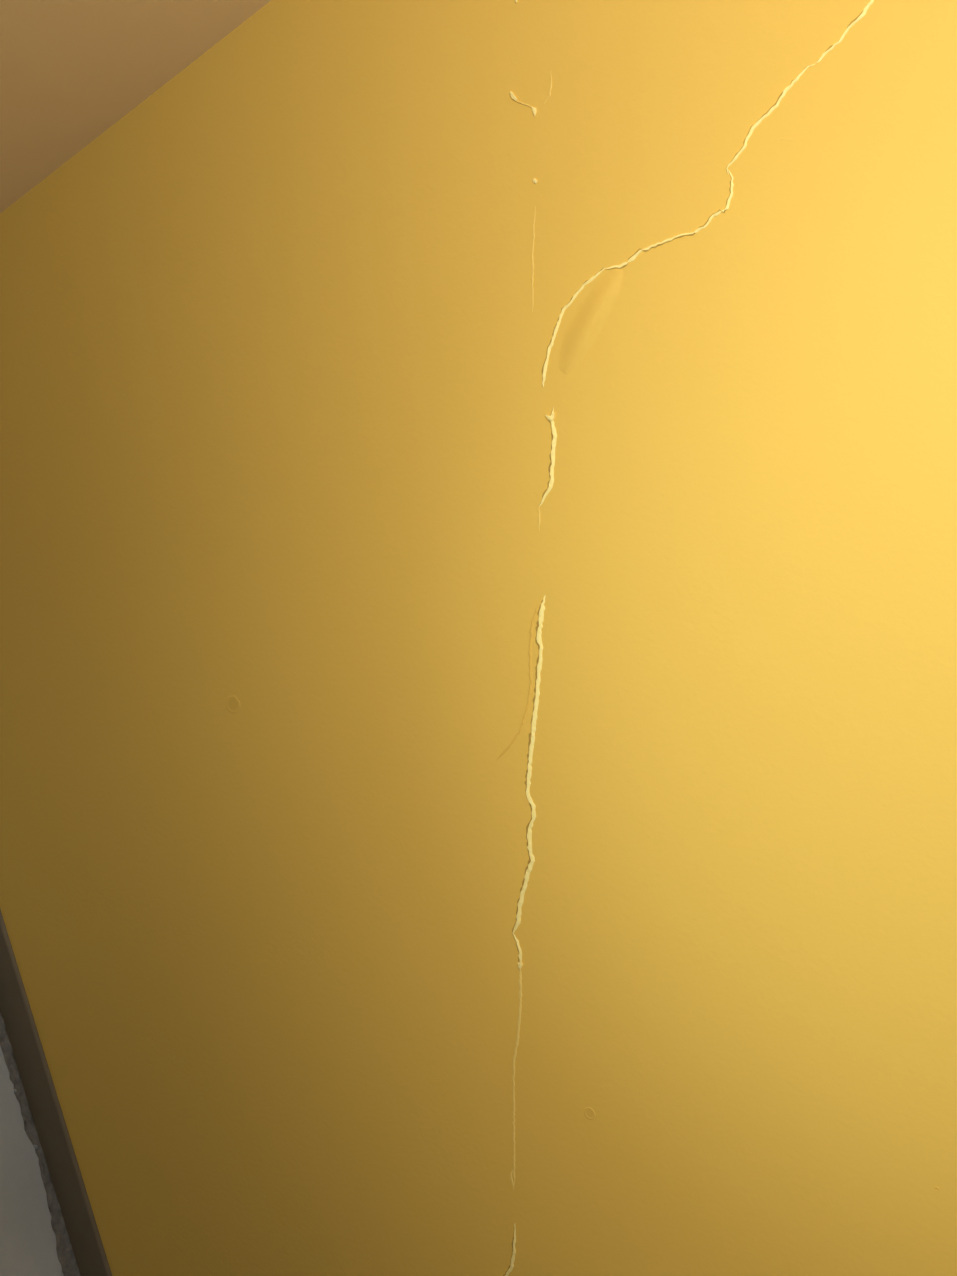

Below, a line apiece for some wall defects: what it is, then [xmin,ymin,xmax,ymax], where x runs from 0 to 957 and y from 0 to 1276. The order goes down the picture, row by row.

crack [510,71,552,116]
crack [532,0,874,531]
crack [496,595,546,1190]
crack [503,1223,516,1276]